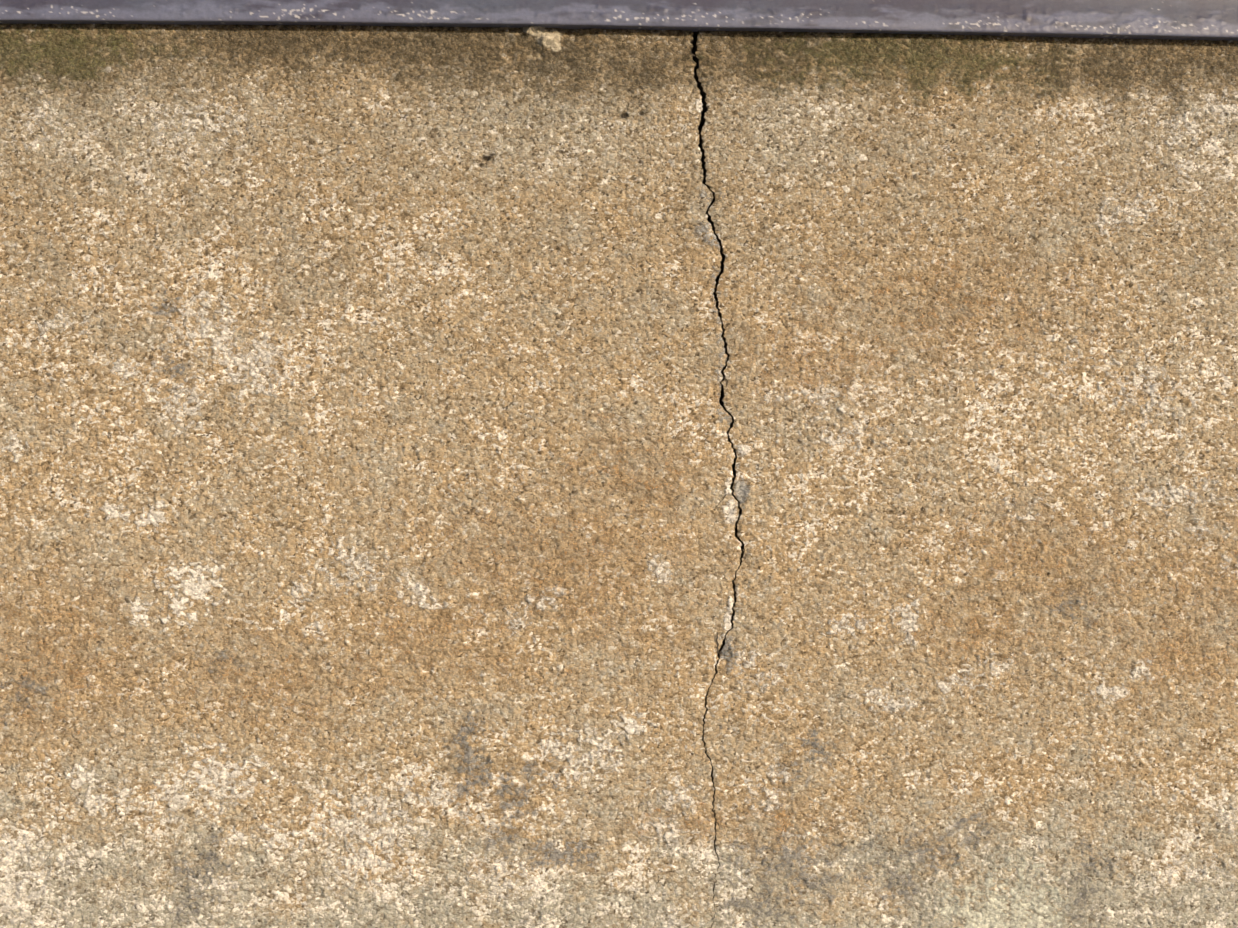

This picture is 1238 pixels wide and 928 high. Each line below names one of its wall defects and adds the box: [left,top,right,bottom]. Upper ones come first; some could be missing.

crack [688,31,751,927]